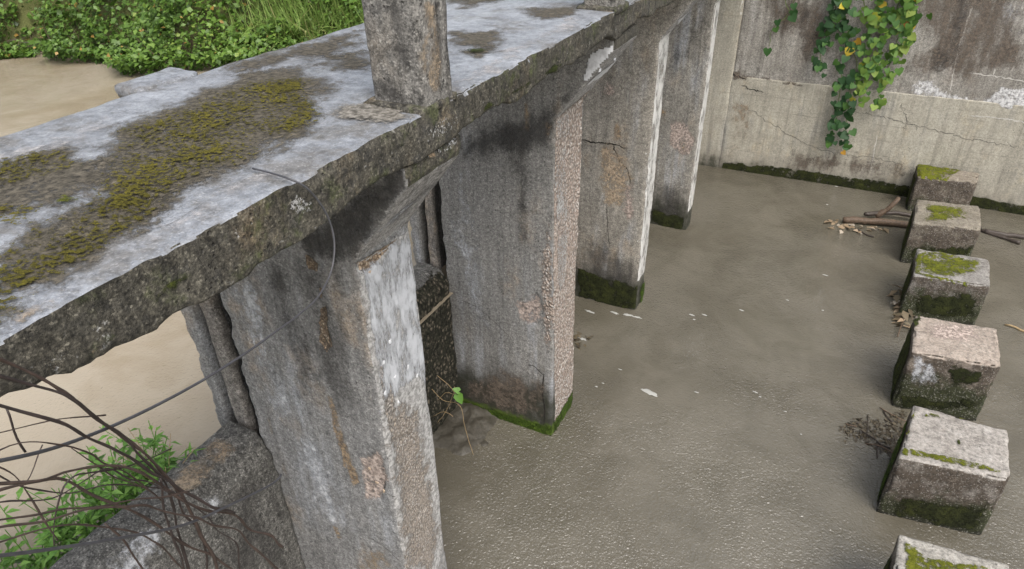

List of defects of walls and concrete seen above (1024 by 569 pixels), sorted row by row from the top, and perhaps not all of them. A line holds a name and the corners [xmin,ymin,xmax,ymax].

damp [767,0,834,61]
damp [912,0,1021,100]
damp [984,87,1024,109]
damp [464,111,553,158]
crack [733,73,1024,171]
crack [585,140,631,184]
damp [792,153,904,176]
spalling [516,46,618,420]
damp [468,370,544,413]